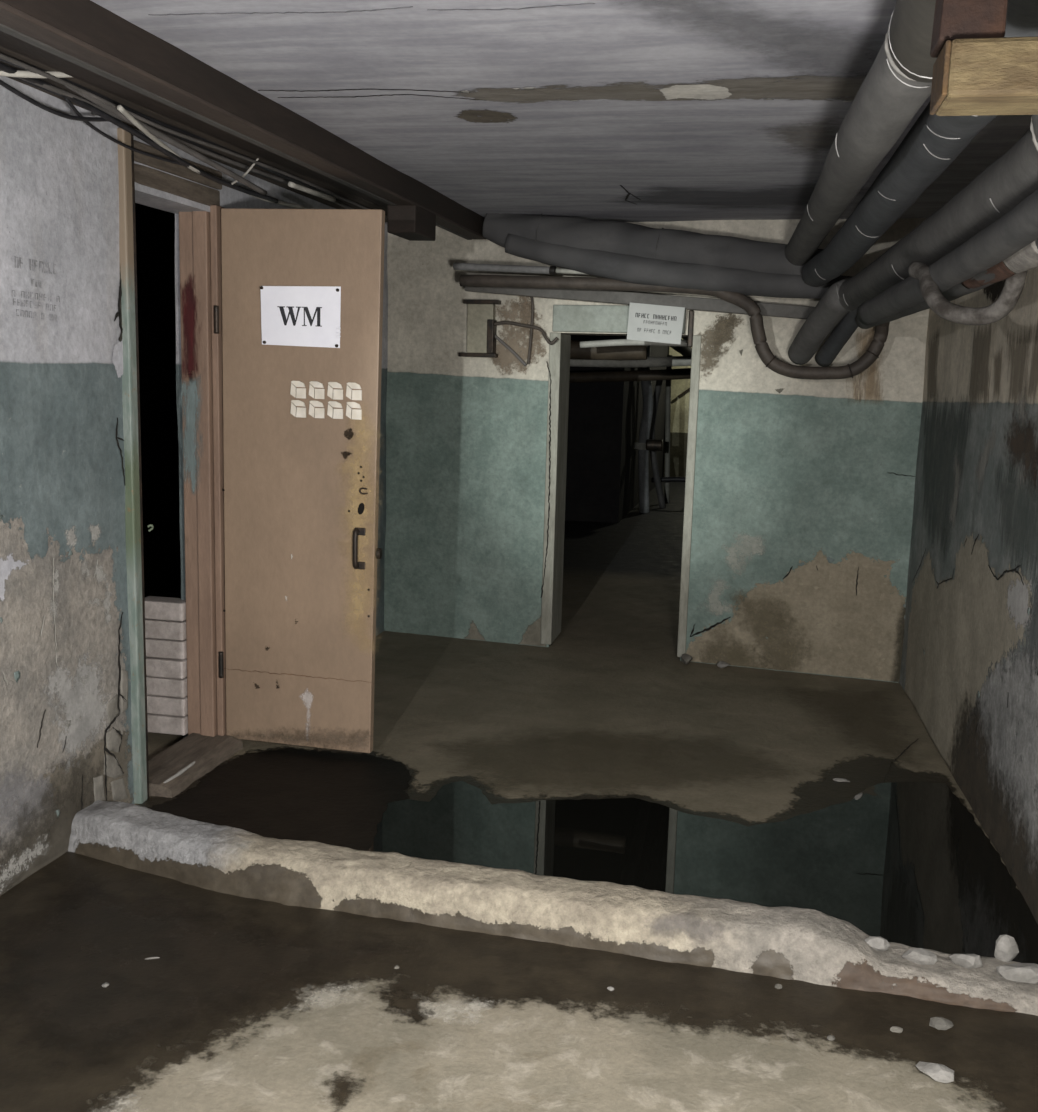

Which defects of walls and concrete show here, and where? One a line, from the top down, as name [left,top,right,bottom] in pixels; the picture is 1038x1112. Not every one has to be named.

spalling [457,74,866,104]
leakage [619,185,815,208]
leakage [780,122,836,151]
crack [912,534,1024,588]
leakage [923,323,1038,673]
peeling [0,514,133,859]
crack [81,612,127,810]
peeling [681,533,1038,871]